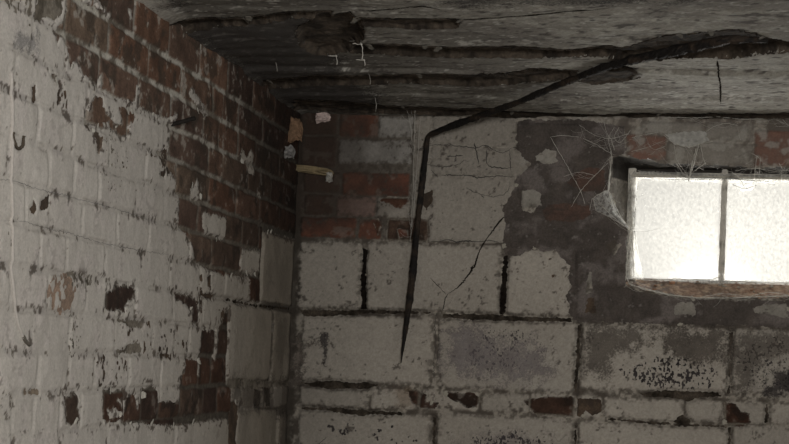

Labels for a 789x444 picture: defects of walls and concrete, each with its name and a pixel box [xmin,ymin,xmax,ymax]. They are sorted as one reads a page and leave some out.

crack [371,4,440,12]
crack [463,8,608,20]
crack [715,61,723,104]
peeling [5,0,789,328]
crack [427,143,516,198]
peeling [47,271,99,358]
crack [431,217,504,375]
peeling [92,281,289,444]
water stain [581,322,789,398]
peeling [63,392,80,427]